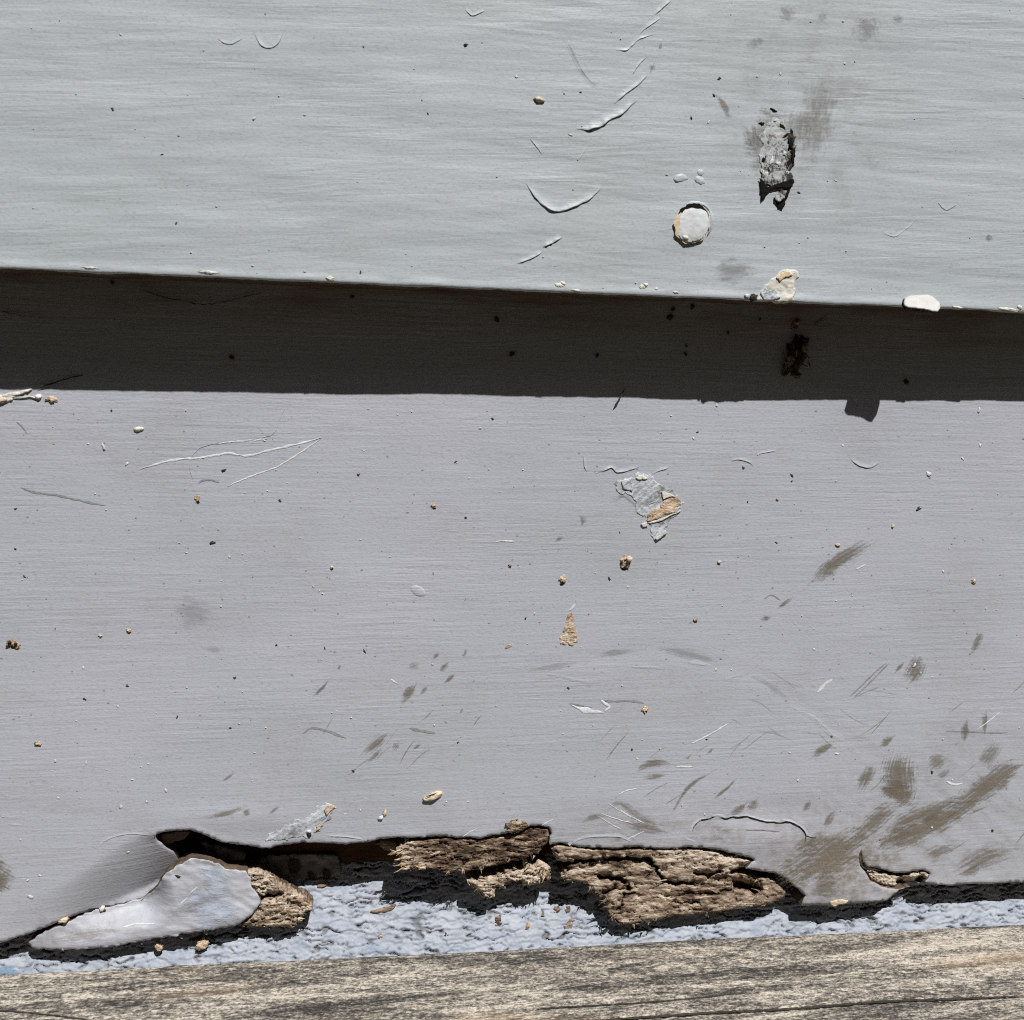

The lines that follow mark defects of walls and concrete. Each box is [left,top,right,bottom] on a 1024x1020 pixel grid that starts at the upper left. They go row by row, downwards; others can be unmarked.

spalling [754,108,797,210]
peeling [745,269,799,304]
peeling [614,472,685,541]
peeling [265,802,337,841]
crack [690,813,816,841]
peeling [0,854,1024,975]